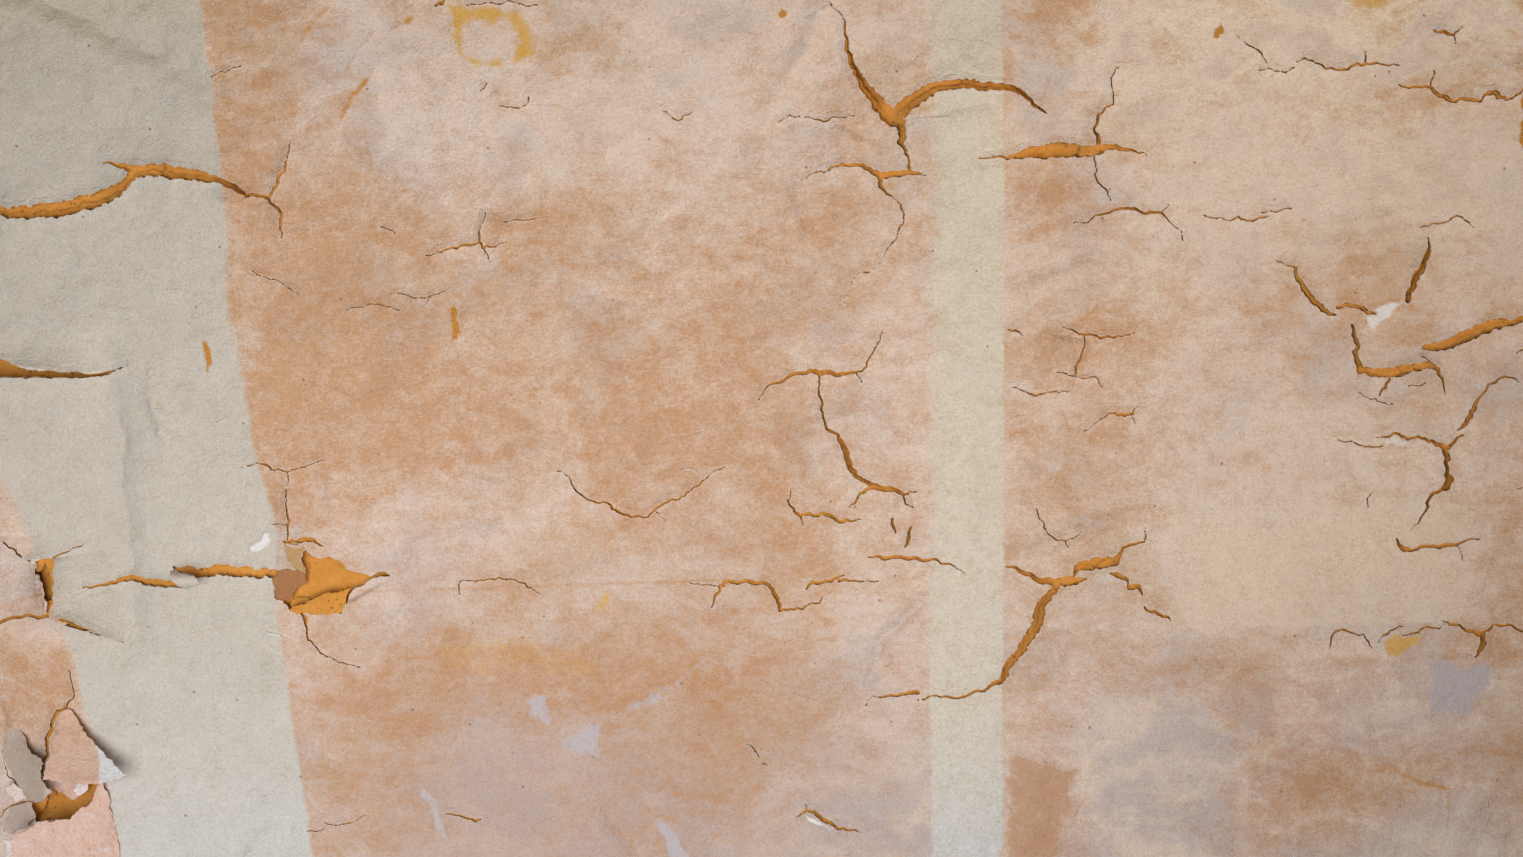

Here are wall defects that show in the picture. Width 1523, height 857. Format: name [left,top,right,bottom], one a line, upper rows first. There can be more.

crack [411,0,544,13]
crack [205,60,247,83]
crack [474,76,535,114]
crack [0,134,305,300]
crack [341,207,543,316]
crack [0,353,136,385]
crack [684,0,1523,719]
crack [0,453,397,825]
crack [452,570,546,600]
peeling [3,709,128,857]